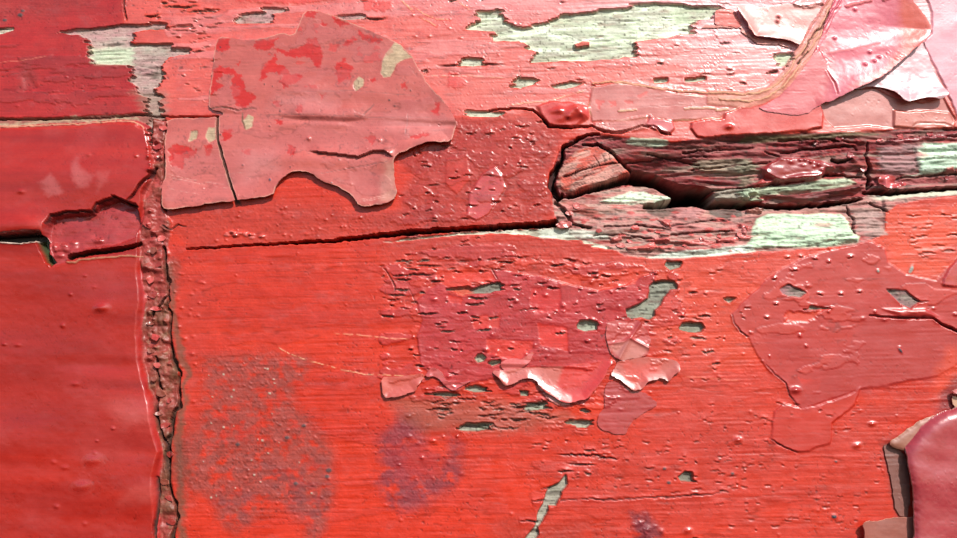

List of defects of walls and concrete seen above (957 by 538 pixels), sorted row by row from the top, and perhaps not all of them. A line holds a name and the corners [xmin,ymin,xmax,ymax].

peeling [36,195,166,284]
crack [0,113,219,127]
peeling [56,7,507,210]
crack [185,219,556,352]
crack [546,262,600,290]
peeling [599,191,671,210]
peeling [462,0,957,138]
peeling [901,142,957,179]
peeling [381,368,493,398]
crack [555,328,567,336]
peeling [474,261,684,434]
peeling [723,213,957,454]